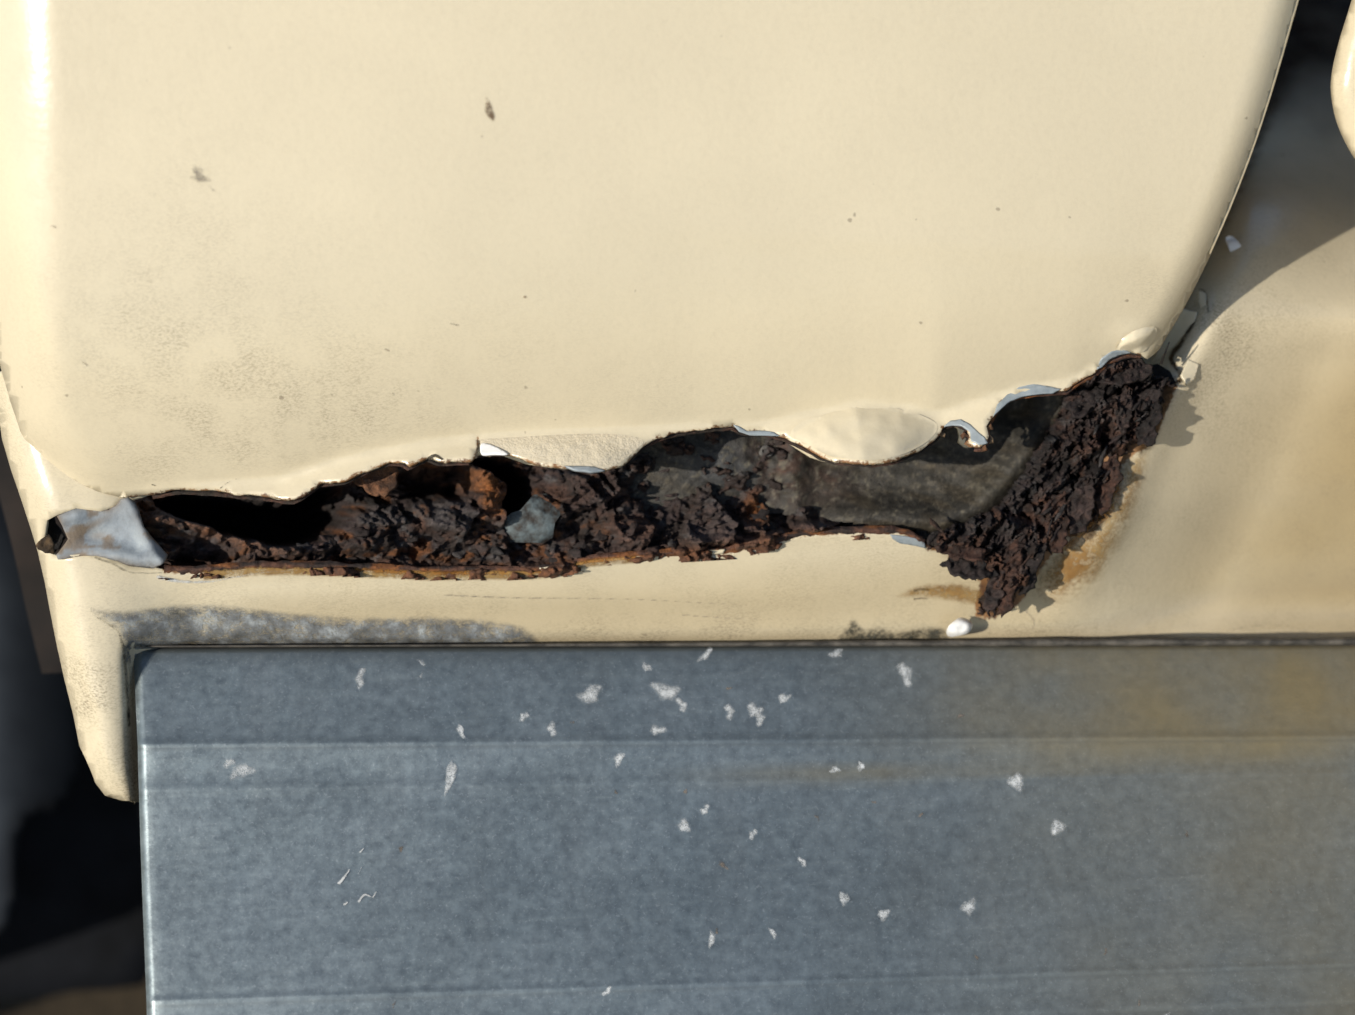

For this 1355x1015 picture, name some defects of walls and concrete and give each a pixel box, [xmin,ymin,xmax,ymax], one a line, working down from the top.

peeling [734,425,779,437]
peeling [480,434,643,474]
peeling [890,290,1207,618]
peeling [353,466,398,498]
corrosion [909,358,1178,616]
peeling [36,497,214,583]
corrosion [203,567,324,579]
corrosion [354,568,541,580]
corrosion [574,556,636,568]
peeling [104,607,534,726]